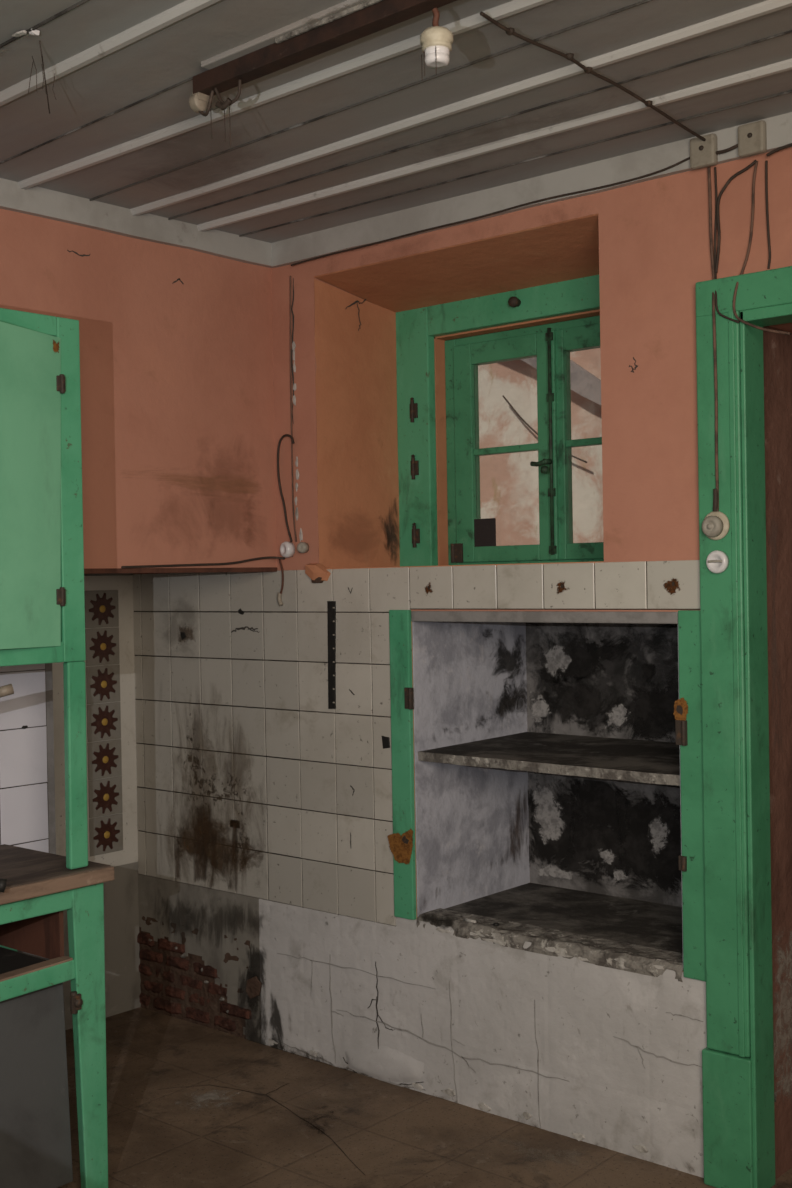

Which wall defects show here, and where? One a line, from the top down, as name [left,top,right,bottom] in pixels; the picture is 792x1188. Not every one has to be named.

corrosion [663,578,680,594]
water stain [483,624,679,742]
water stain [175,729,260,886]
water stain [528,776,682,894]
flaking render [137,916,252,1039]
spalling [416,908,683,982]
crack [277,953,569,1128]
crack [613,1036,701,1068]